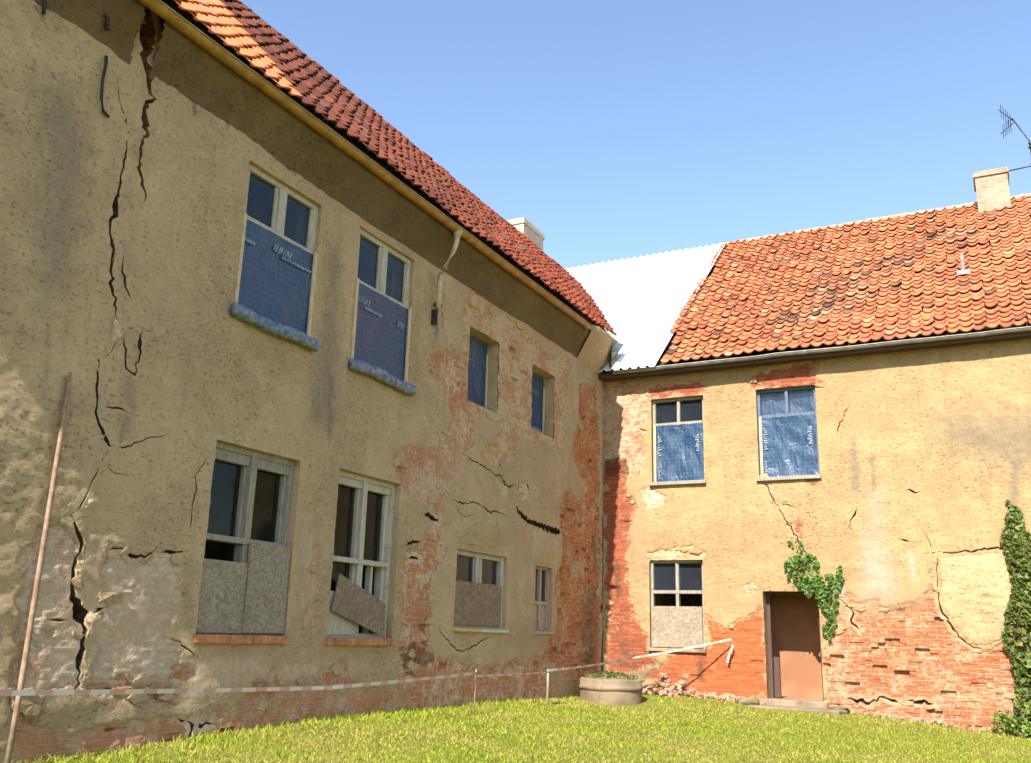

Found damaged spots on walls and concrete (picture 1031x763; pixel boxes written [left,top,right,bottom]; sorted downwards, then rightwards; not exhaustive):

crack [42,11,216,701]
spalling [747,360,827,391]
spalling [9,292,767,763]
crack [759,473,820,571]
crack [842,506,861,534]
crack [833,594,866,637]
spalling [822,567,1031,733]